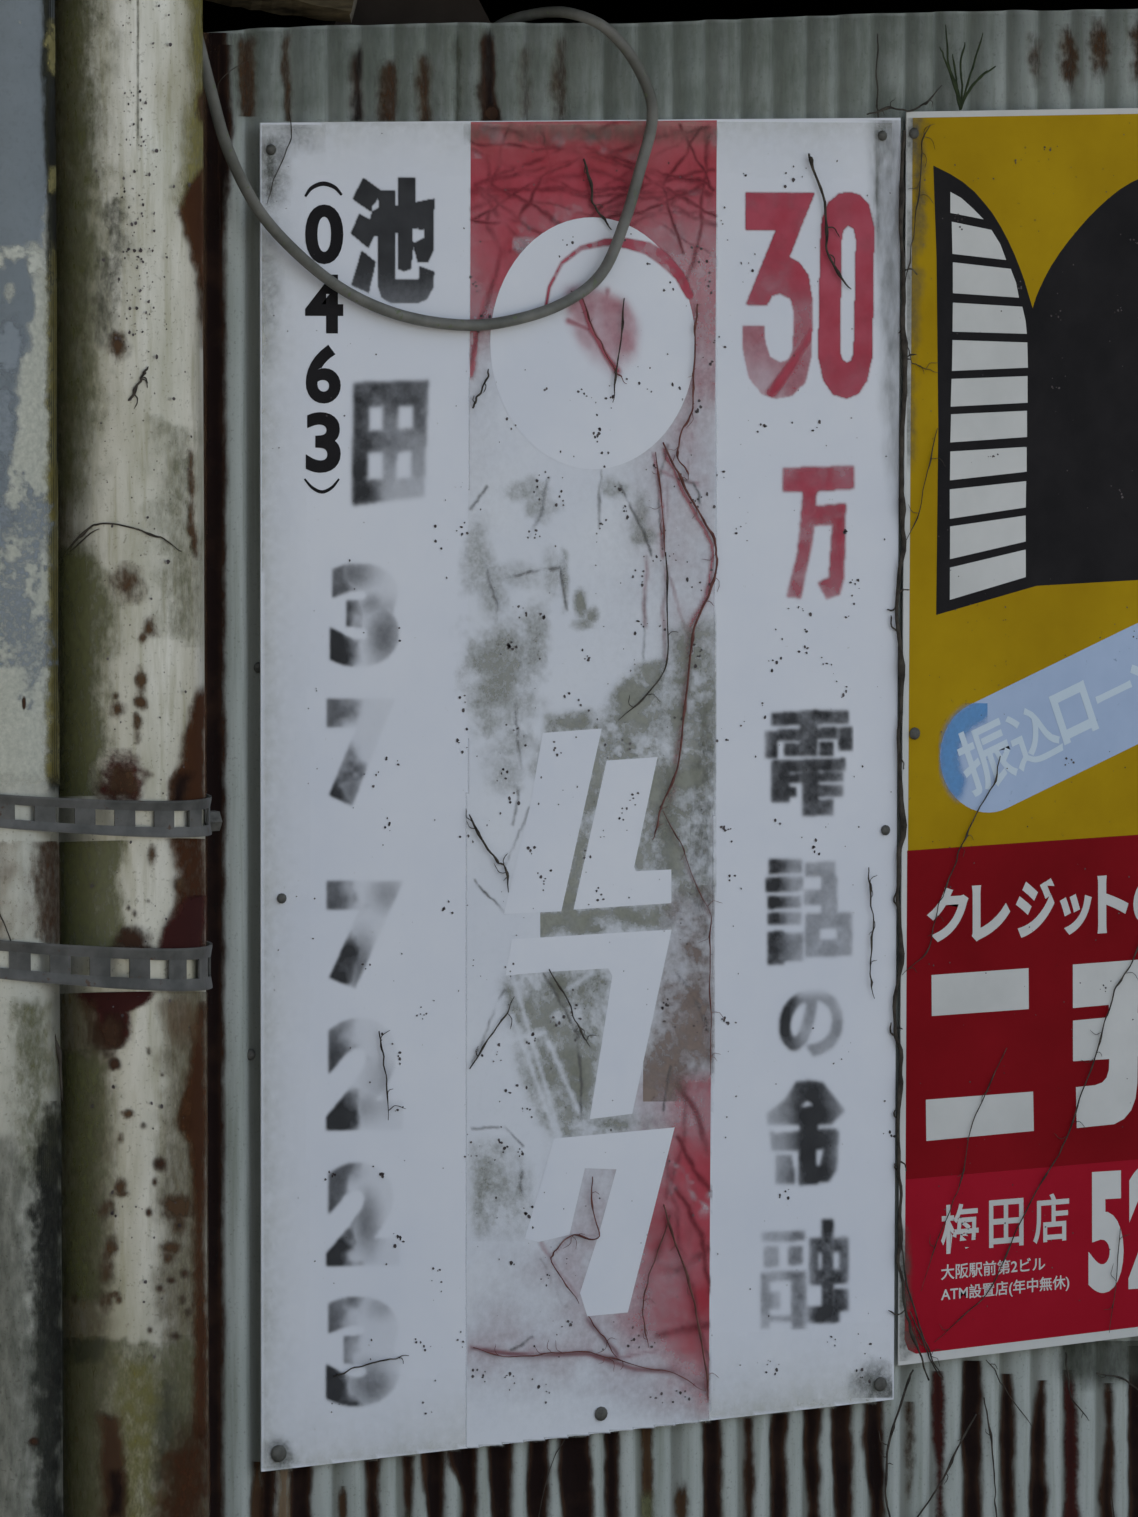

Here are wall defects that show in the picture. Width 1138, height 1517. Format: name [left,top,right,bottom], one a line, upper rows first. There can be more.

peeling [0,0,55,709]
corrosion [98,672,149,801]
corrosion [113,33,255,1517]
corrosion [78,992,153,1070]
corrosion [250,1462,313,1517]
corrosion [366,1458,381,1517]
corrosion [403,1431,620,1517]
corrosion [675,1419,723,1517]
corrosion [743,1401,885,1517]
corrosion [932,1361,983,1517]
corrosion [1000,1370,1080,1517]
corrosion [1099,1354,1138,1517]